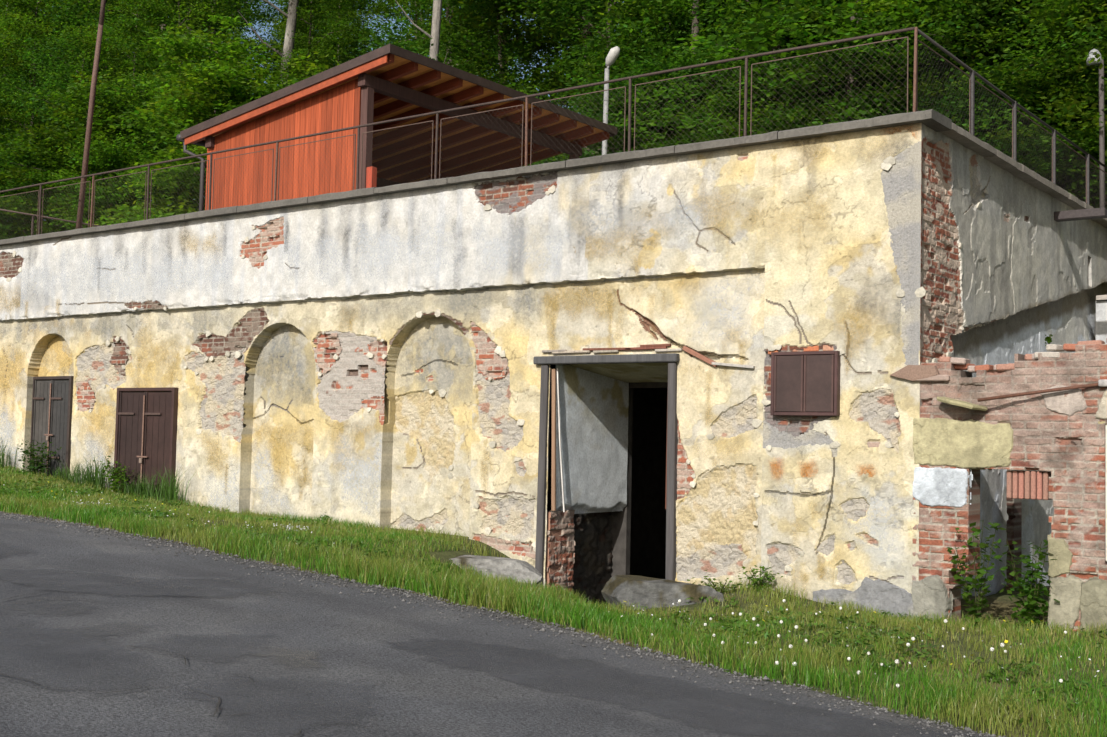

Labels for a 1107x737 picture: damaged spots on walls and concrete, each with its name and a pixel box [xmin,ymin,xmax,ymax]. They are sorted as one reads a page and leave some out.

flaking render [0,251,24,282]
flaking render [240,217,284,269]
flaking render [471,171,558,215]
crack [673,190,736,252]
flaking render [881,137,995,365]
spalling [184,307,270,443]
spalling [313,328,455,482]
spalling [414,309,525,452]
crack [617,289,693,357]
crack [766,299,815,346]
crack [843,322,888,374]
spalling [676,421,835,582]